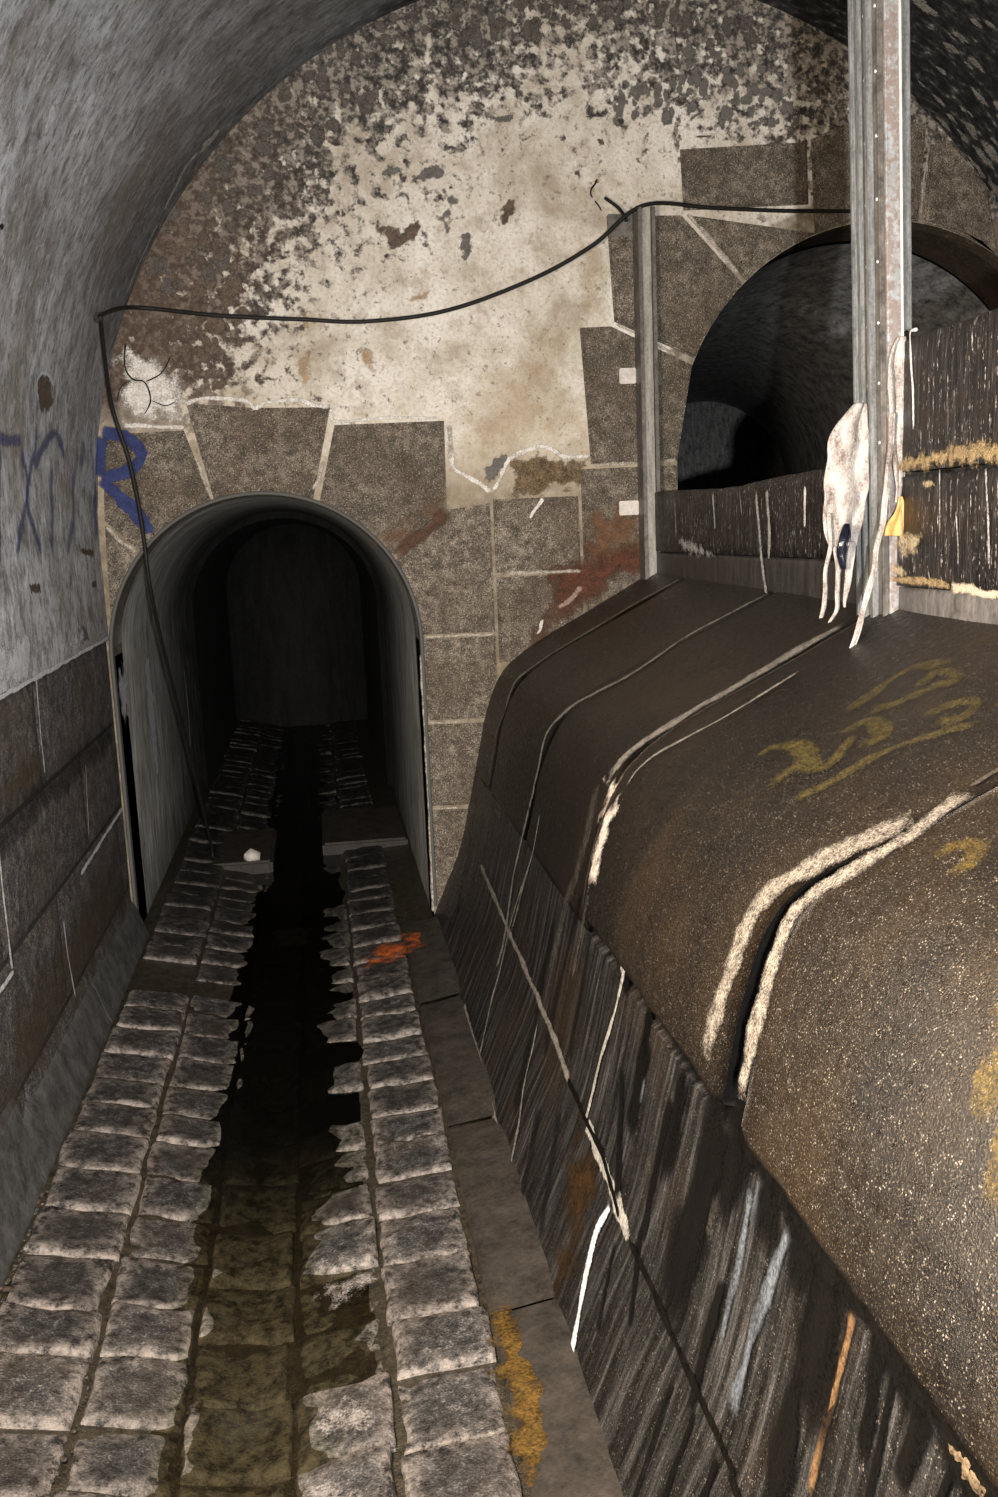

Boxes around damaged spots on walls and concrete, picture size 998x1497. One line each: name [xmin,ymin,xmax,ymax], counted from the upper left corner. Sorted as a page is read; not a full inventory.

peeling [126,0,801,498]
rust [397,510,448,554]
rust [534,510,640,640]